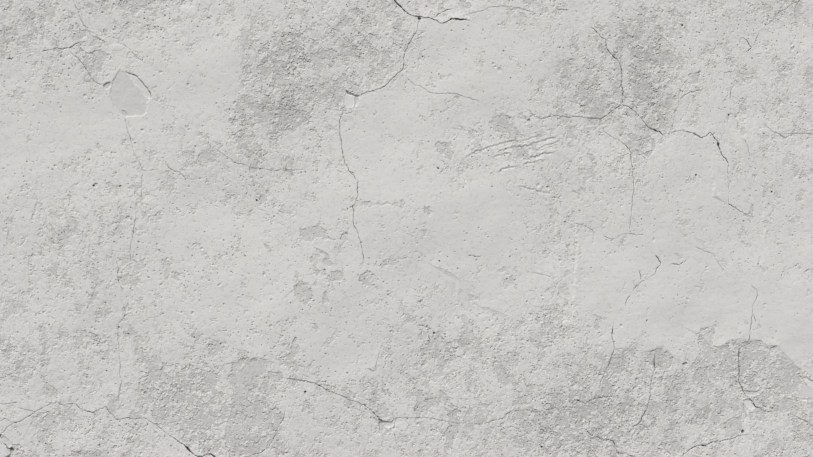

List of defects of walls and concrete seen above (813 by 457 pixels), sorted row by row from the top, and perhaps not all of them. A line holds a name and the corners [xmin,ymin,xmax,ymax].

spalling [103,69,152,117]
crack [361,0,532,95]
crack [530,27,745,239]
crack [1,317,215,457]
peeling [698,325,813,439]